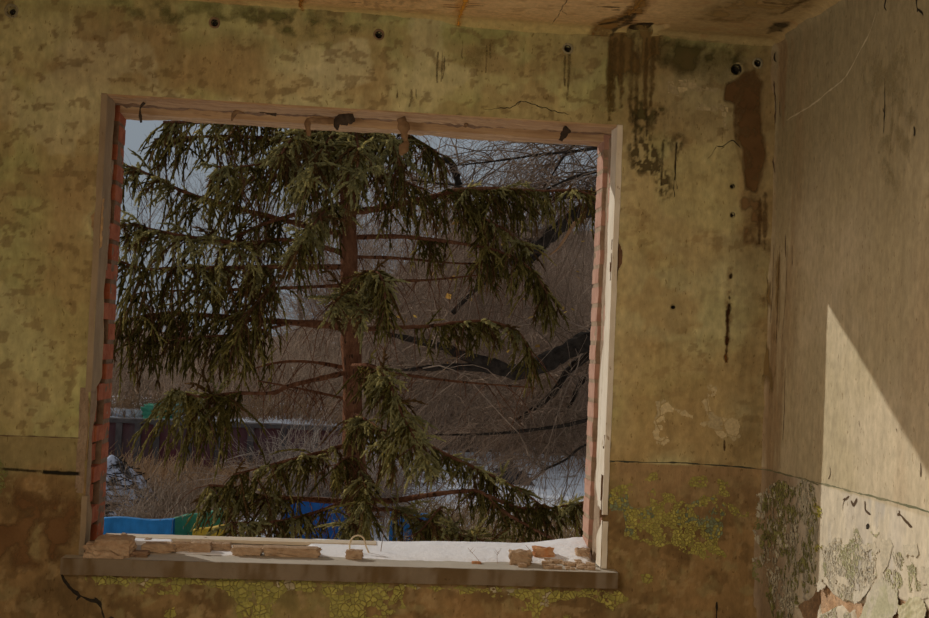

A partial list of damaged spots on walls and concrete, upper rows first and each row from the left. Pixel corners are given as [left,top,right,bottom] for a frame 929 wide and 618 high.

water stain [591,0,715,196]
water stain [724,70,767,245]
crack [60,574,114,618]
peeling [752,479,929,618]